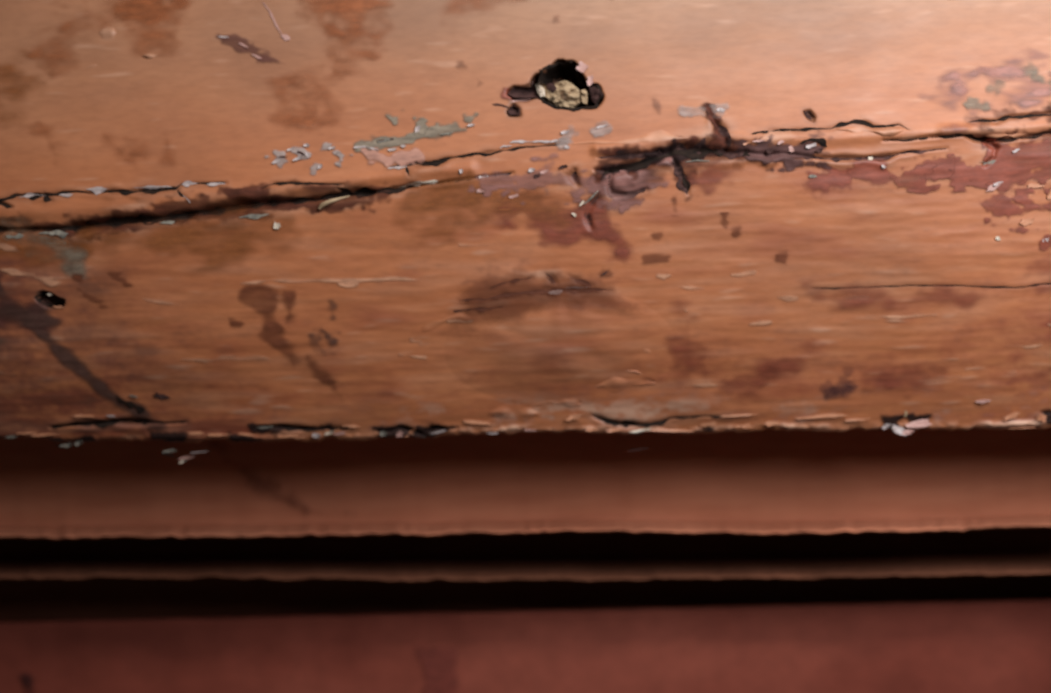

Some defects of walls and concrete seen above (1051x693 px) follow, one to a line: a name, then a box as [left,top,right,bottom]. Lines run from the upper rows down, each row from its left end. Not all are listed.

peeling [576,61,594,86]
spalling [493,99,530,116]
crack [0,140,558,240]
peeling [265,113,478,175]
peeling [740,111,825,178]
crack [572,103,1051,226]
peeling [868,138,1051,233]
water stain [240,286,295,357]
water stain [0,285,163,430]
peeling [150,420,499,464]
peeling [566,414,780,435]
peeling [795,411,932,436]